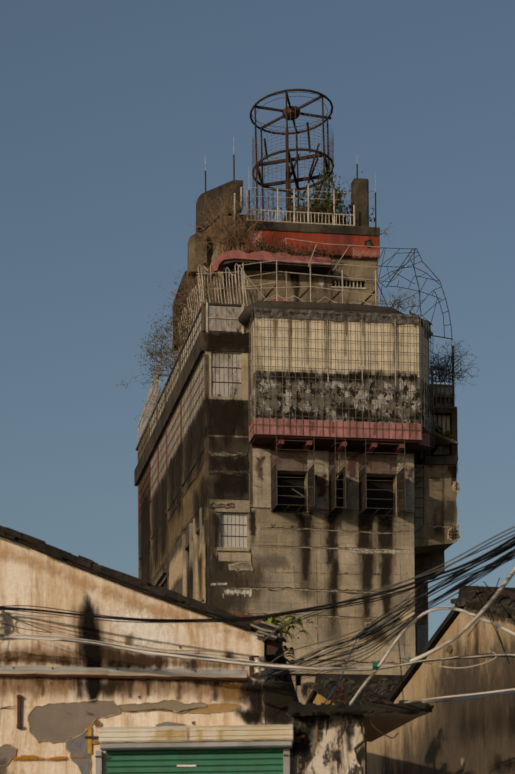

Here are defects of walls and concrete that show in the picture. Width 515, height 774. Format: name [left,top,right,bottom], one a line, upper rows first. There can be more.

water stain [189,398,250,495]
water stain [140,444,189,559]
water stain [187,556,252,598]
water stain [297,514,311,596]
water stain [327,513,338,631]
water stain [348,516,409,641]
water stain [0,603,229,669]
spalling [0,744,17,766]
spalling [27,695,241,774]
water stain [98,679,315,756]
water stain [331,715,364,761]
water stain [382,644,515,774]